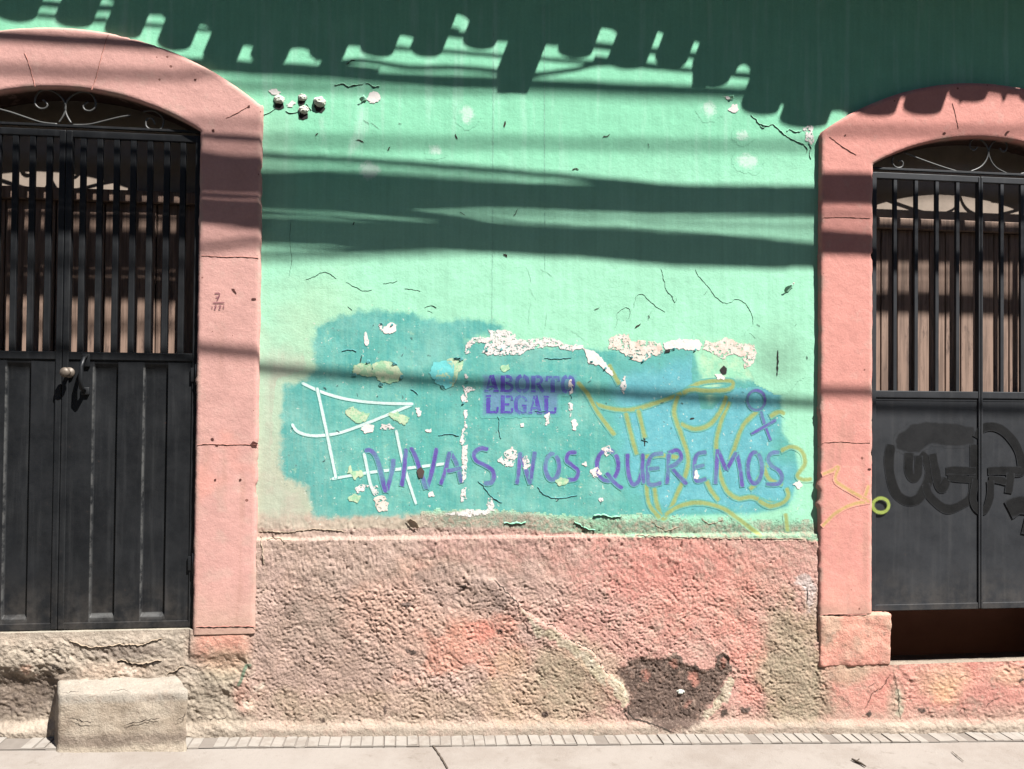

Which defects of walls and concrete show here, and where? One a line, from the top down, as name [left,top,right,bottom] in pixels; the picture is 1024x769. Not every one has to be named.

crack [751,115,853,159]
crack [289,219,436,313]
peeling [379,322,396,334]
crack [615,269,677,327]
crack [696,271,755,338]
peeling [352,360,404,386]
peeling [345,406,422,434]
spalling [406,329,818,544]
peeling [347,465,389,512]
crack [29,638,226,723]